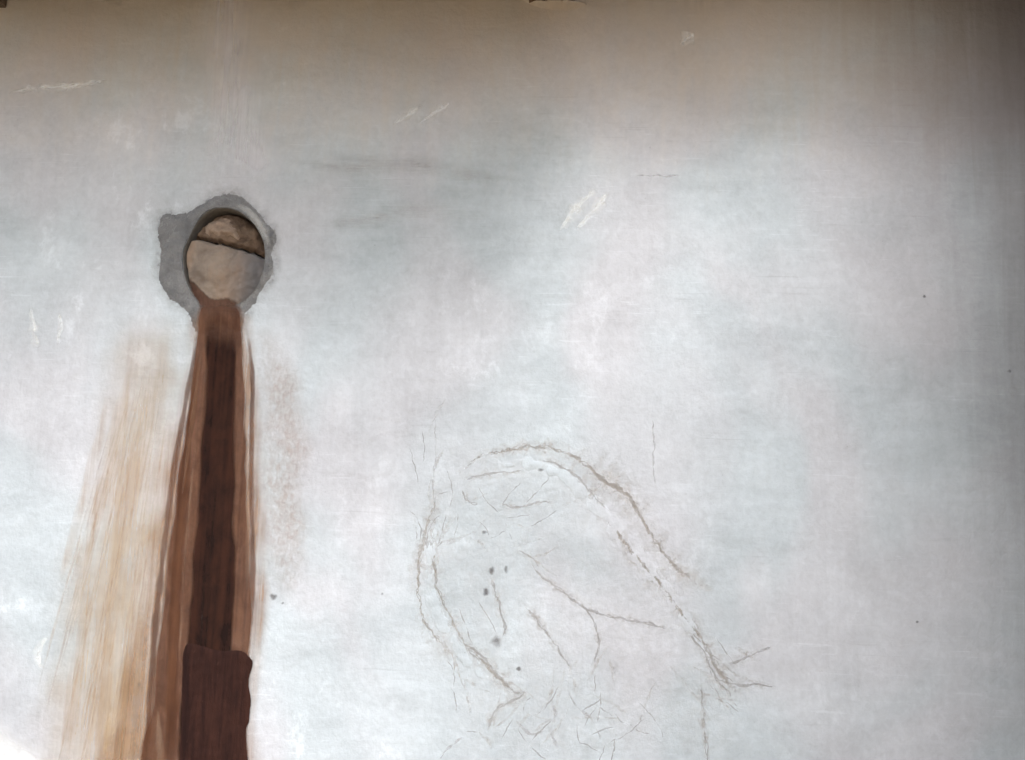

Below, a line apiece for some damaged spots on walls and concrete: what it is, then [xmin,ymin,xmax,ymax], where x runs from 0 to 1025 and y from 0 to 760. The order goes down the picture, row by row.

rust [105,280,265,760]
crack [416,498,525,725]
crack [462,443,771,760]